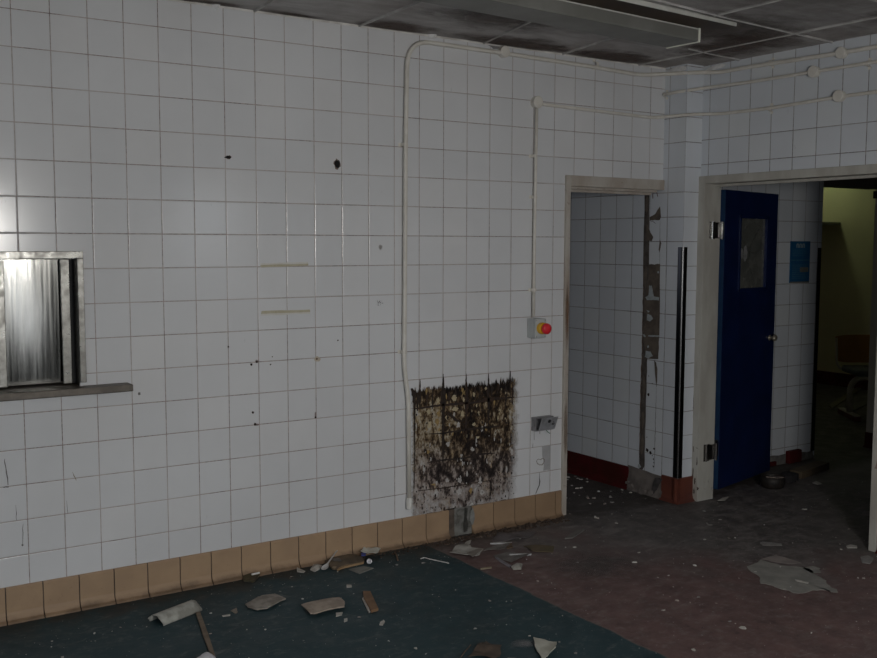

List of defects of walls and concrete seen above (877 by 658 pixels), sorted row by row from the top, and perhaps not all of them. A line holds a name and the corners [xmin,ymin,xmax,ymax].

spalling [646,207,661,252]
spalling [643,264,660,387]
water stain [411,371,517,532]
peeling [627,465,663,499]